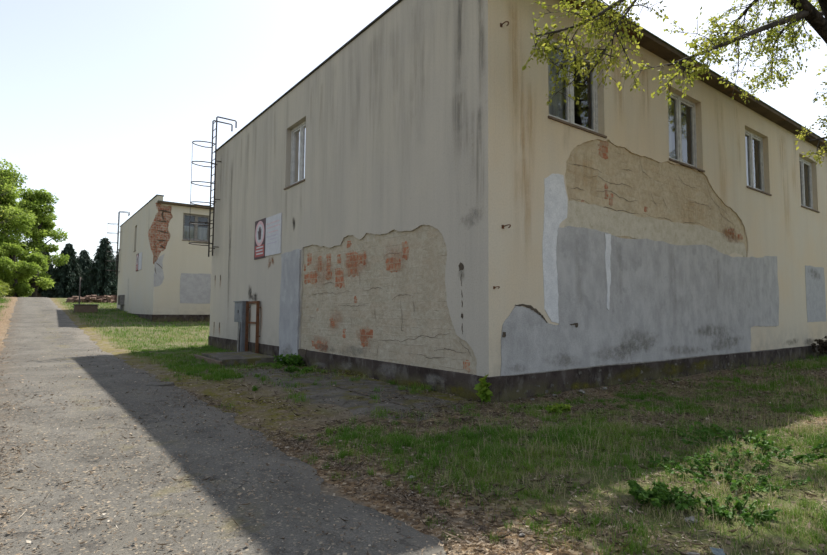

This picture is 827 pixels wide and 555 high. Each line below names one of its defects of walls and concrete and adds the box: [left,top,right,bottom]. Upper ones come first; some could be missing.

spalling [148,202,173,264]
spalling [565,140,747,257]
spalling [301,225,477,375]